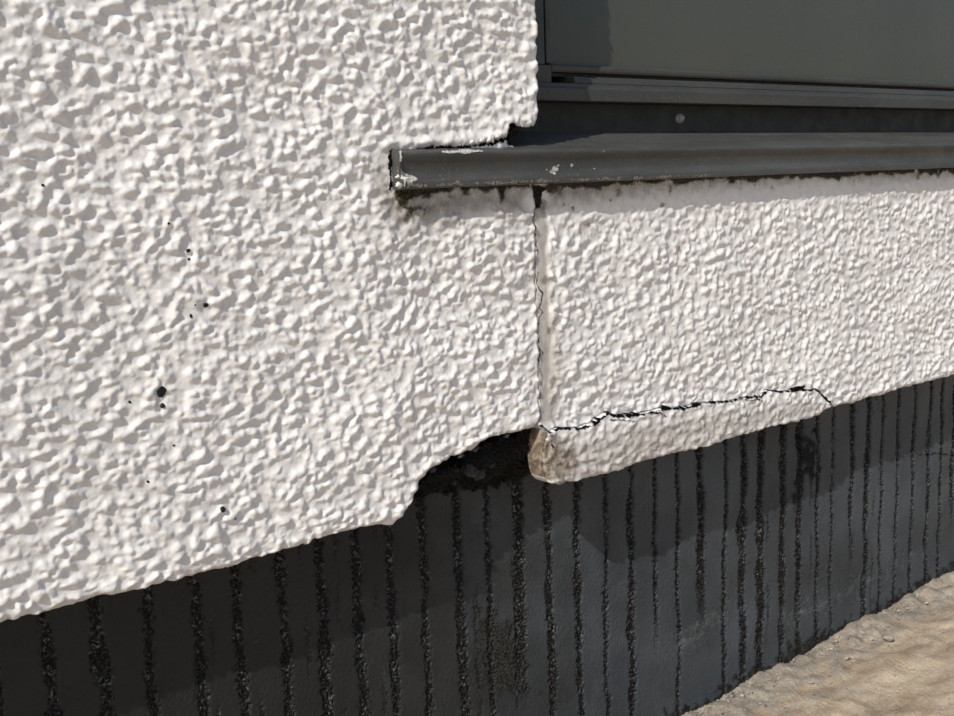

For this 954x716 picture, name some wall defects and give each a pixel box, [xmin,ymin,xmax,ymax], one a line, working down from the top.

crack [532,185,834,448]
spalling [413,428,532,501]